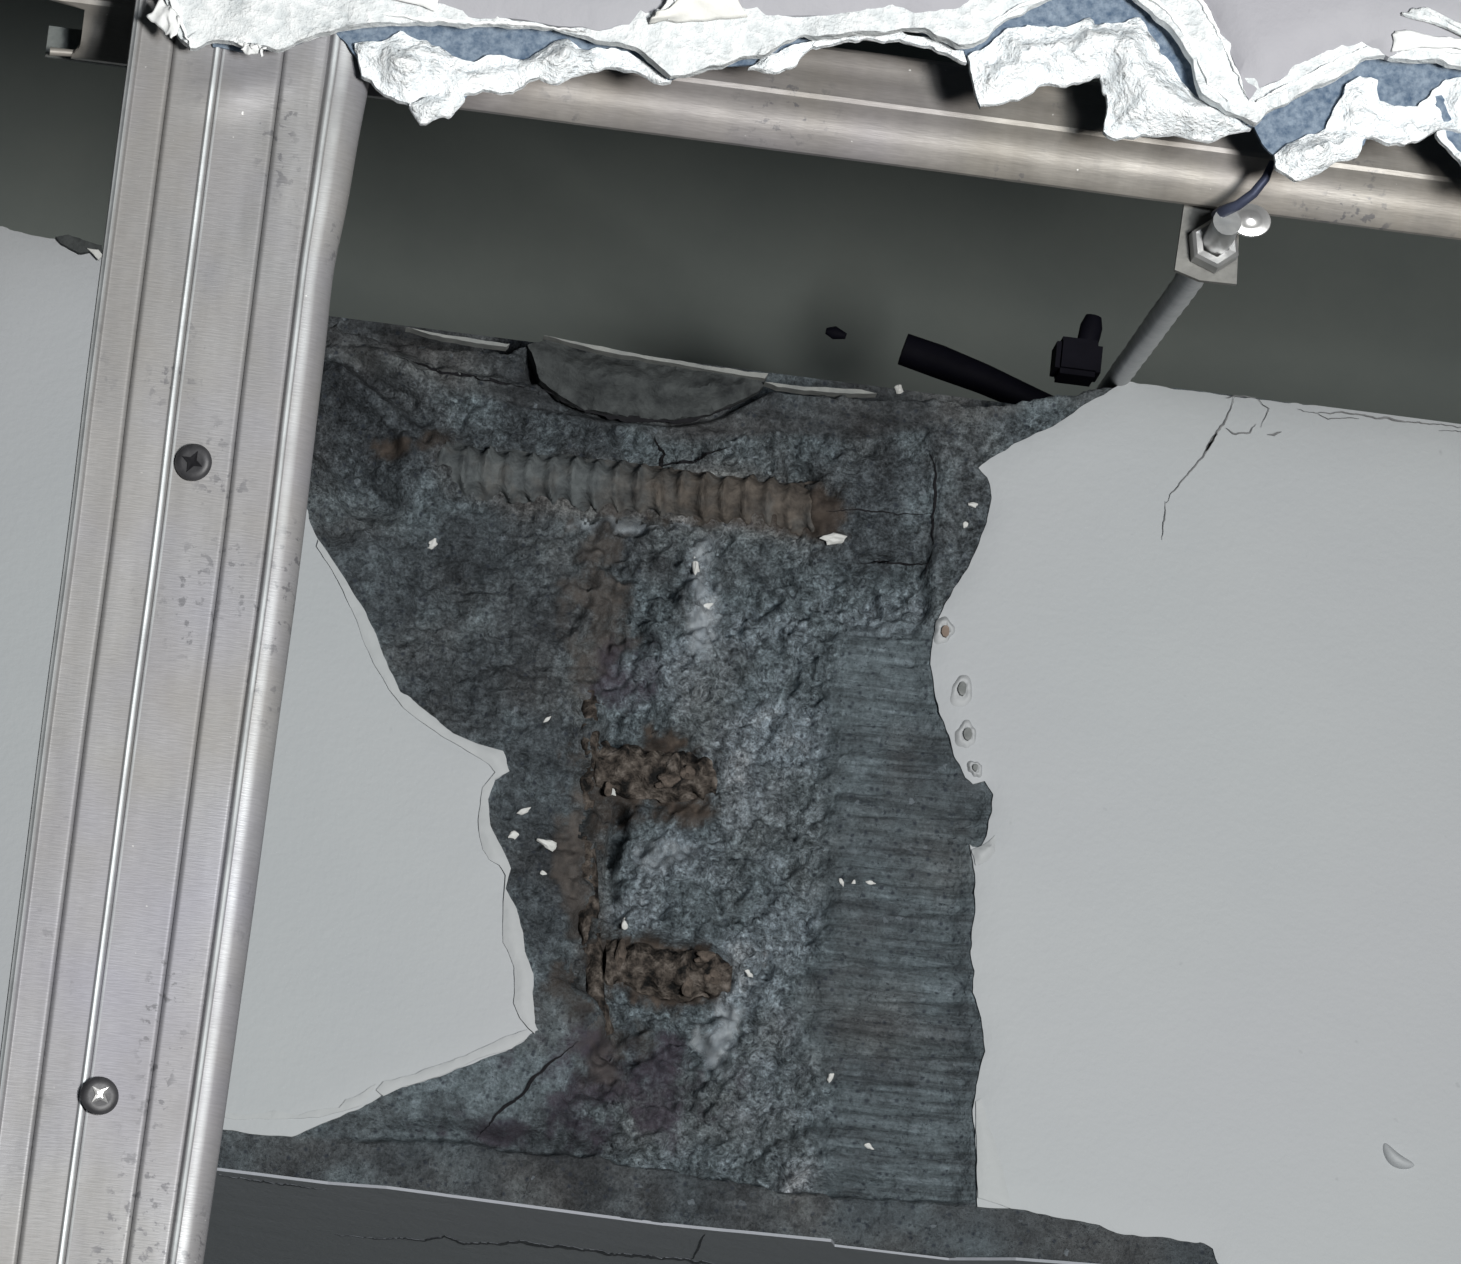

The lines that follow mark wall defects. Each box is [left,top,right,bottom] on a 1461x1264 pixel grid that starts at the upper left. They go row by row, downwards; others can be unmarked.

crack [396,356,743,467]
crack [1162,393,1461,536]
corrosion [604,725,709,827]
spalling [217,316,1217,1264]
corrosion [589,935,722,1009]
crack [477,1044,575,1138]
crack [219,1174,328,1190]
crack [335,1234,714,1264]